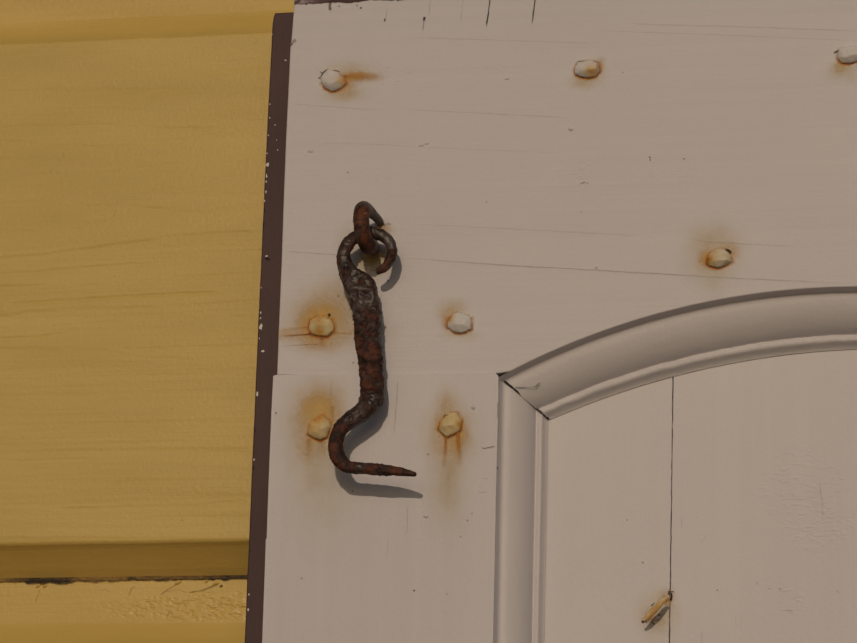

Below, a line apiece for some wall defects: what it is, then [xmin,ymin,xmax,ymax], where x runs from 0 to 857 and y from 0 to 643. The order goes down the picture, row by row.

corrosion [322,72,370,93]
corrosion [289,301,343,346]
corrosion [301,393,336,453]
corrosion [435,404,467,453]